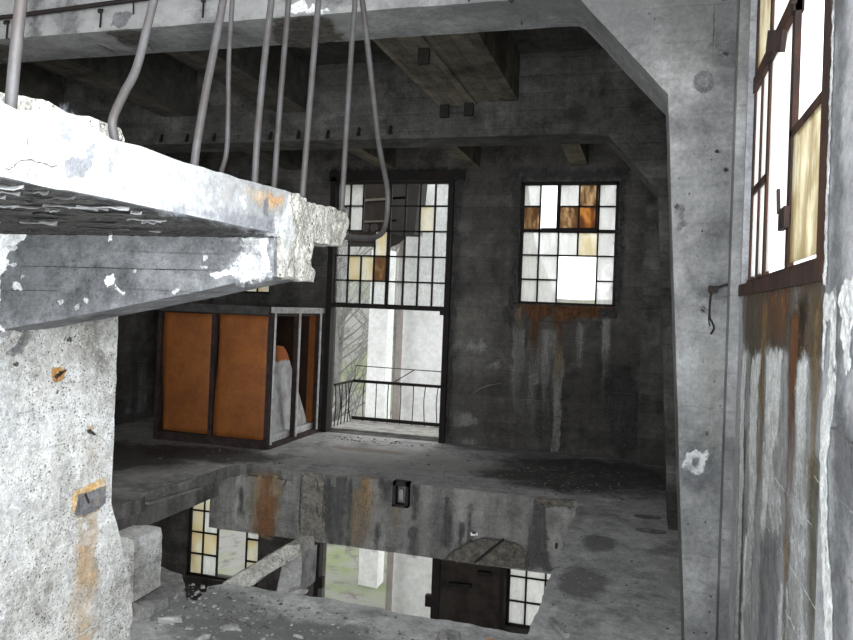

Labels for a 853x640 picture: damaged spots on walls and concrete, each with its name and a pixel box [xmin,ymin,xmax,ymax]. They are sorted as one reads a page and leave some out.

crack [0,134,63,176]
peeling [0,184,167,242]
peeling [104,274,125,295]
peeling [241,233,275,273]
corrosion [234,474,283,536]
leakage [530,330,563,452]
corrosion [515,304,617,375]
leakage [503,167,630,380]
leakage [733,348,817,640]
corrosion [742,281,826,604]
peeling [819,0,853,640]
leakage [828,387,853,640]